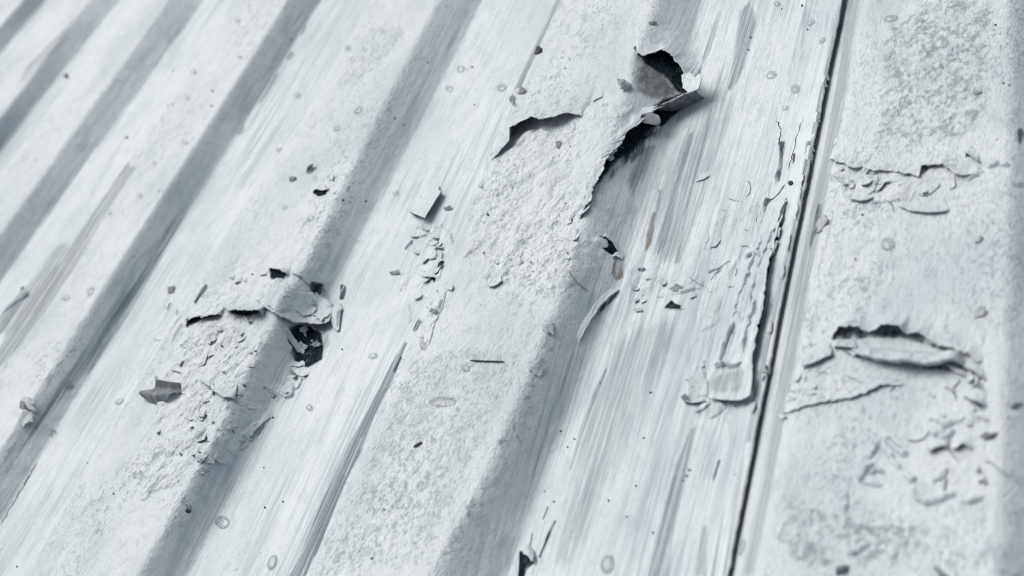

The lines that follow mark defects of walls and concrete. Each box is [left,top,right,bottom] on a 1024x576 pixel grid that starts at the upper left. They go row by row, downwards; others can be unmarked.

peeling [127,255,346,501]
peeling [389,186,455,327]
peeling [626,0,991,570]